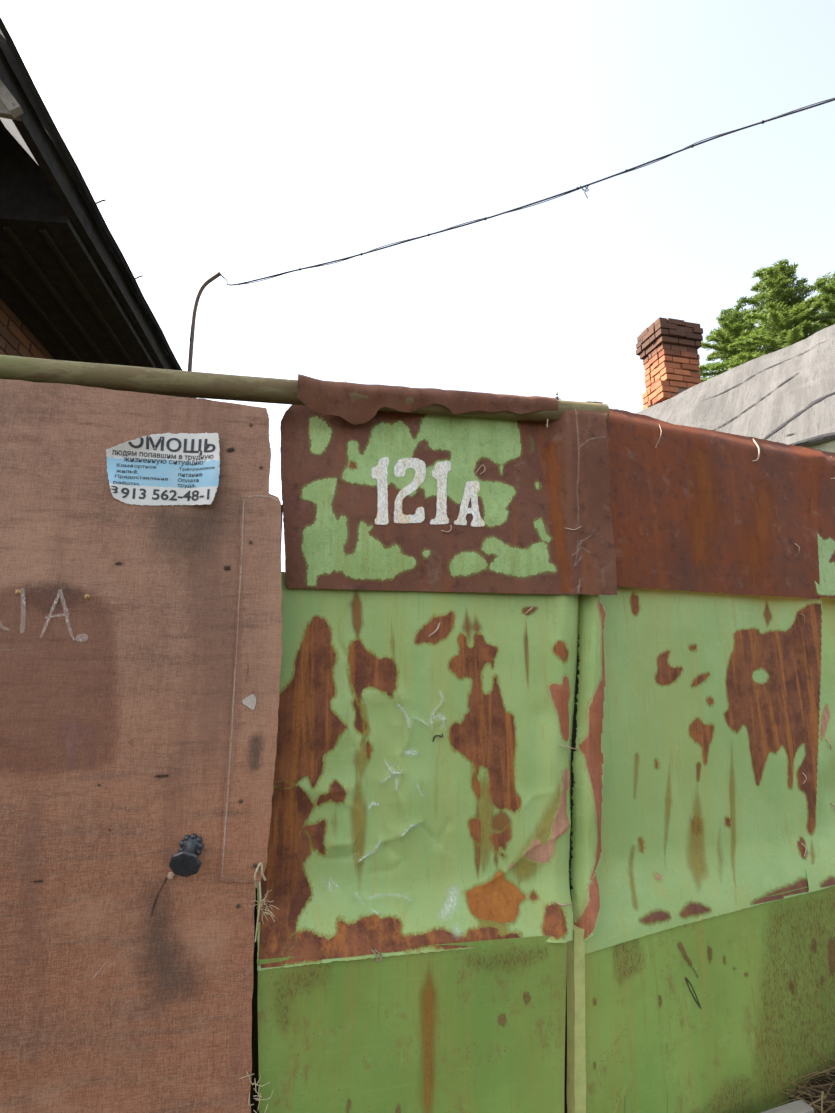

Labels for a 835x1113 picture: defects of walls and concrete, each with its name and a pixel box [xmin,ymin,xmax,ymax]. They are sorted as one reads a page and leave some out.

rust [258,593,606,1024]
rust [655,650,710,687]
rust [689,603,830,860]
rust [423,977,434,1113]